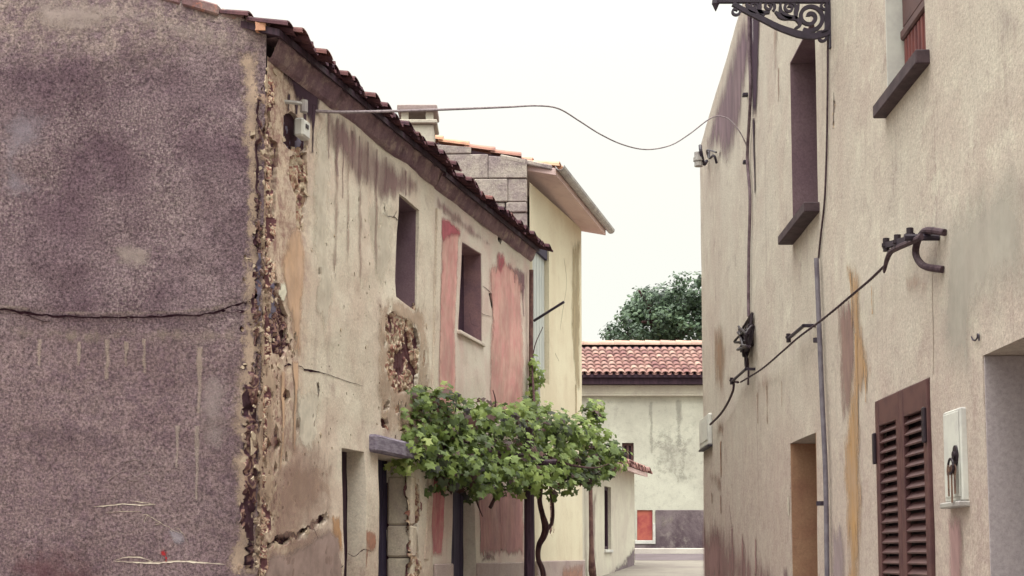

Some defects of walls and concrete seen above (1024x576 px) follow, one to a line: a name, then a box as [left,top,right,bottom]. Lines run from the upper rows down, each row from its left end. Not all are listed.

water stain [284,73,413,255]
water stain [711,5,759,193]
crack [0,301,254,322]
spalling [229,54,342,576]
crack [284,363,362,397]
peeling [376,219,460,433]
corrosion [838,267,867,576]